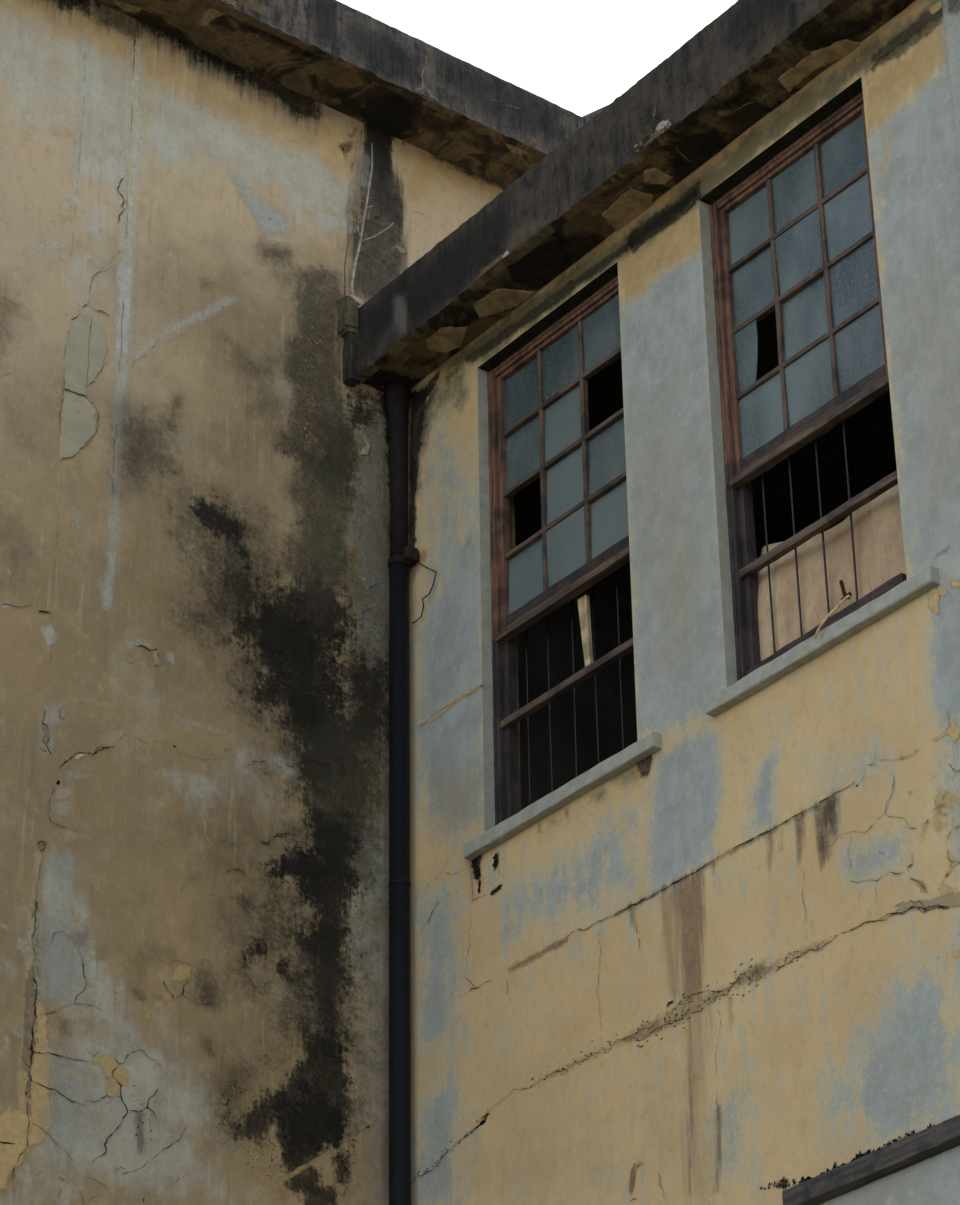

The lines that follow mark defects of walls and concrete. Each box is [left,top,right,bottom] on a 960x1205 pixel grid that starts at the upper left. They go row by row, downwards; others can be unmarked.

water stain [54,0,320,120]
water stain [335,93,469,299]
water stain [426,128,730,361]
flaking render [59,269,109,460]
crack [0,603,54,650]
peeling [0,841,95,1191]
crack [139,958,214,1017]
water stain [188,497,388,1205]
water stain [471,847,503,895]
crack [412,751,948,1182]
peeling [933,789,960,895]
crack [11,1050,202,1204]